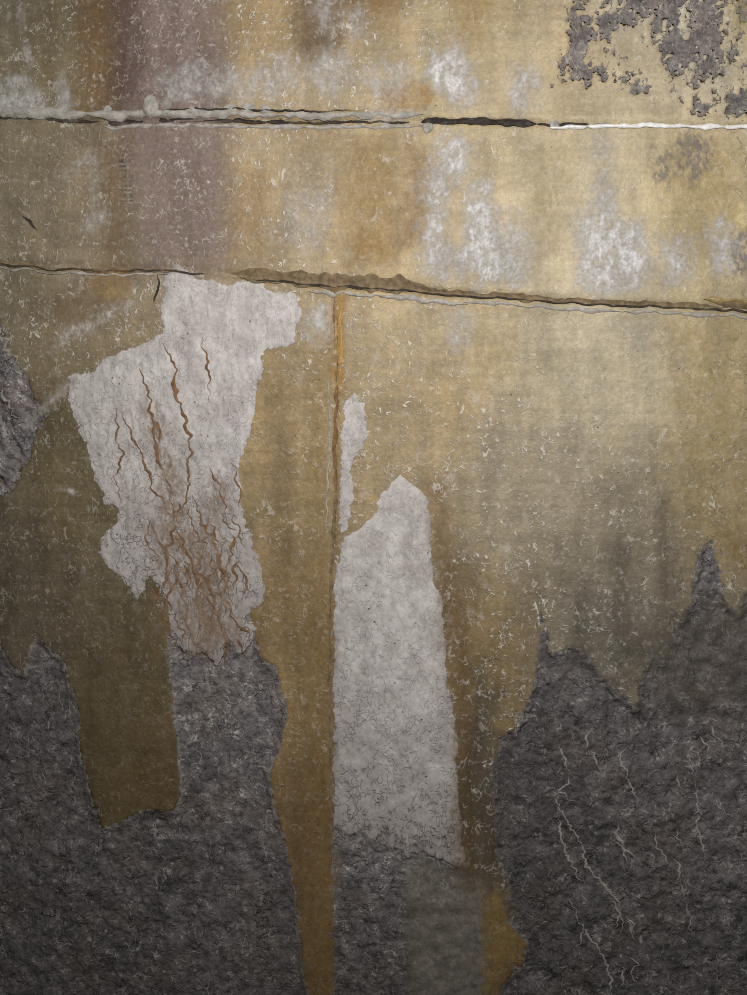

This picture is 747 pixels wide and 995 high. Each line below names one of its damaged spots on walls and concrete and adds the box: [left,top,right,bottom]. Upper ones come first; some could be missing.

crack [0,94,747,134]
leakage [426,47,478,106]
peeling [551,0,747,124]
leakage [53,294,132,348]
crack [0,260,204,301]
leakage [424,137,526,288]
leakage [571,190,650,293]
spalling [0,264,310,995]
rust [113,342,250,668]
flaking render [329,393,484,995]
crack [231,268,747,867]
spalling [490,540,747,995]